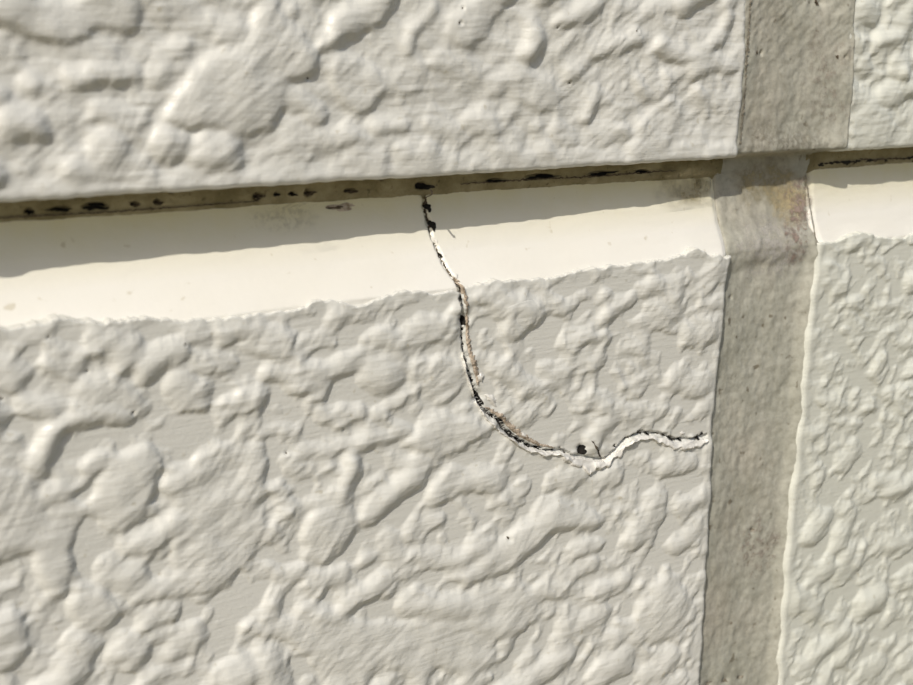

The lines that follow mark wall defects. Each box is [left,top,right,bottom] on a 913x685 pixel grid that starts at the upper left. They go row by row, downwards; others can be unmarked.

crack [415,183,708,476]